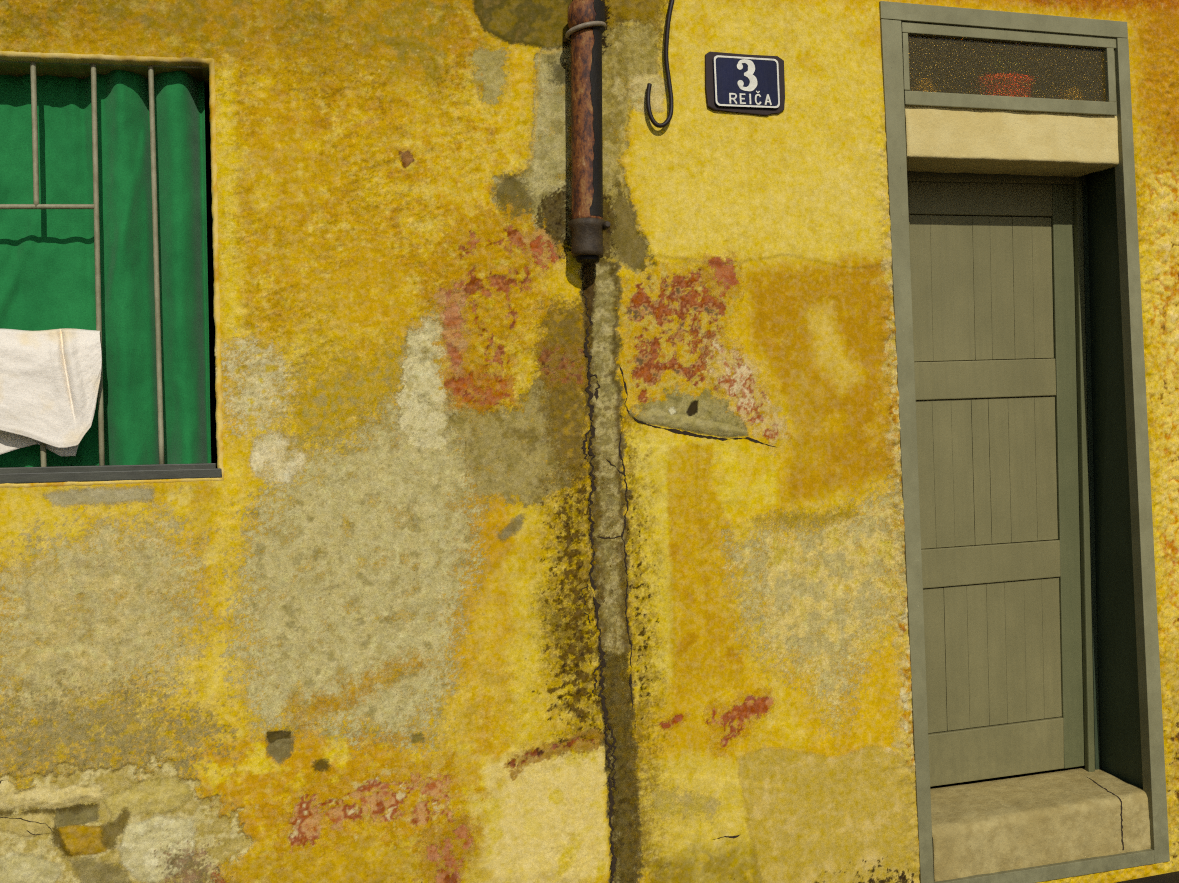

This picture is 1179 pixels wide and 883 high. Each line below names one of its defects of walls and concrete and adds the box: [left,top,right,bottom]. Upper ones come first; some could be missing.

leakage [474,0,573,84]
leakage [497,173,572,259]
leakage [601,0,668,54]
peeling [602,19,792,456]
flaking render [0,42,604,883]
leakage [532,464,659,883]
crack [581,264,775,883]